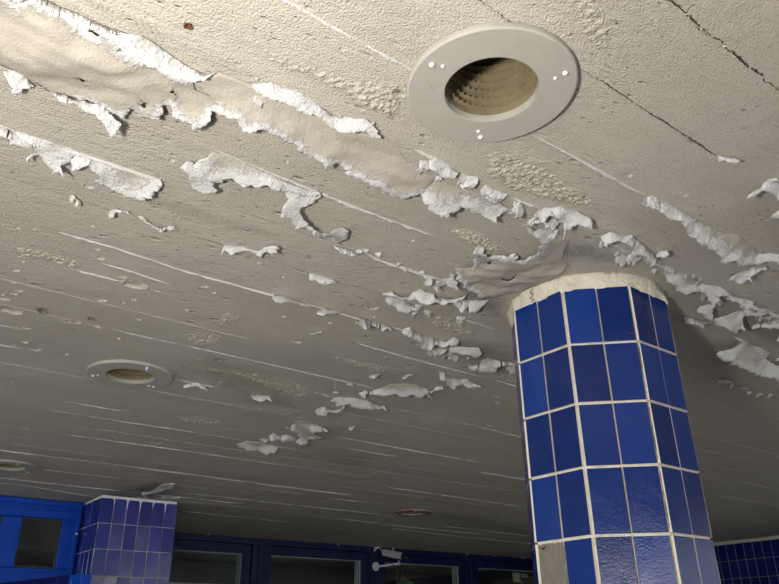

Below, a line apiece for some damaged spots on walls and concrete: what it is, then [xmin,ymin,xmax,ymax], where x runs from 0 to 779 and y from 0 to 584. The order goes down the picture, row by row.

crack [476,0,511,22]
spalling [569,0,612,50]
crack [666,0,778,91]
crack [580,68,751,180]
peeling [709,155,741,163]
peeling [746,178,779,200]
peeling [0,0,602,456]
peeling [599,196,779,383]
peeling [136,483,181,500]